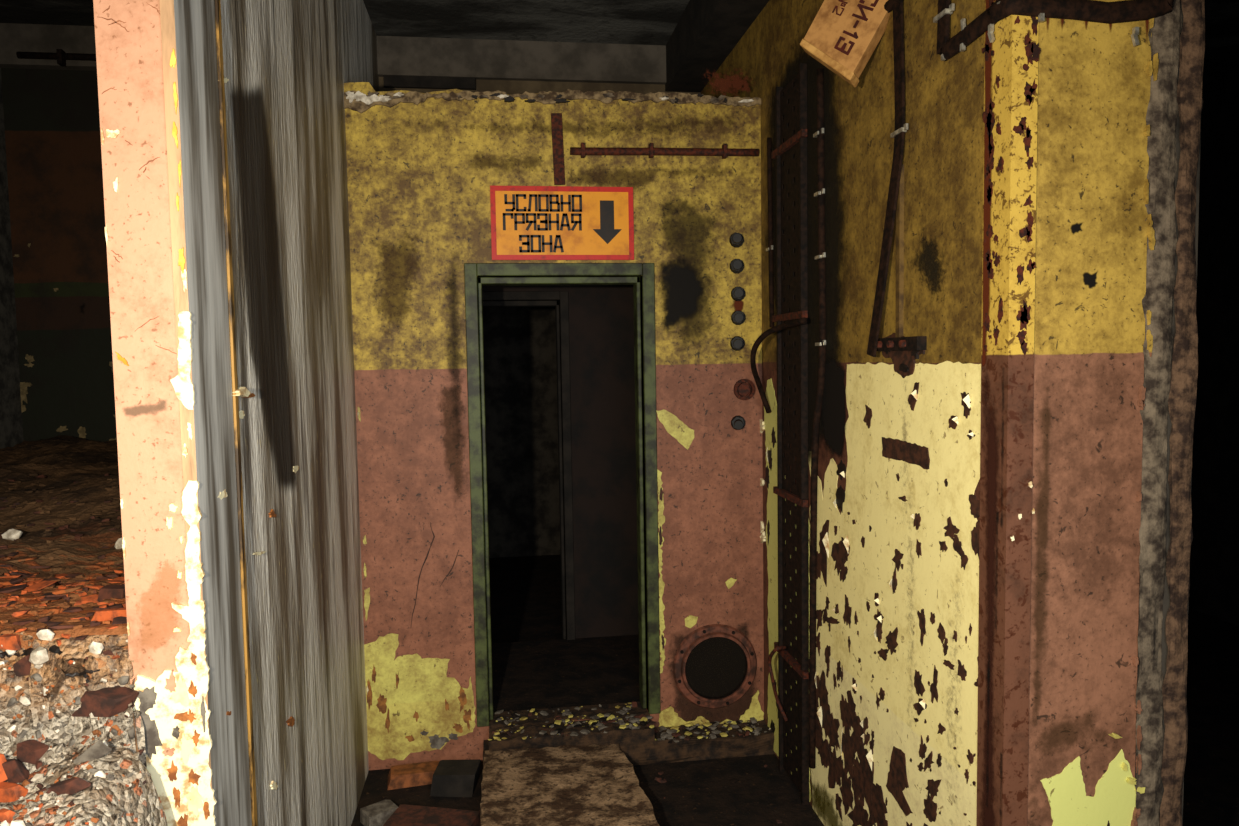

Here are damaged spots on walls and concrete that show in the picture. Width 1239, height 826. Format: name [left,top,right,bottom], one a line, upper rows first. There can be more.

peeling [20,382,32,412]
peeling [56,426,87,438]
peeling [133,481,217,826]
peeling [232,387,255,419]
peeling [364,633,476,760]
peeling [656,333,981,826]
rust [981,16,1064,826]
spalling [1040,0,1205,826]